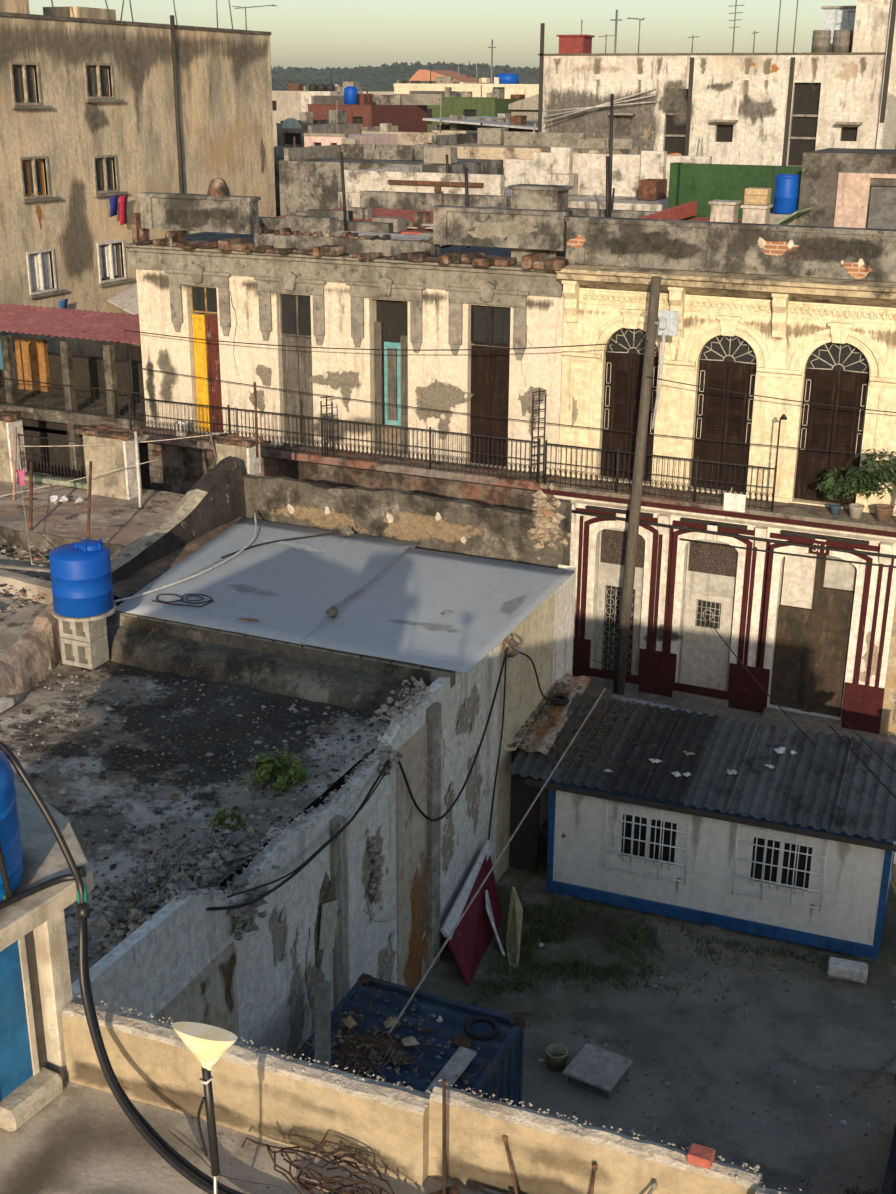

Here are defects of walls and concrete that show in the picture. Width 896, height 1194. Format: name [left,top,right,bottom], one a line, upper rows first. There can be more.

leakage [0,26,267,111]
spalling [756,237,799,259]
spalling [841,258,872,280]
leakage [146,352,176,423]
flaking render [361,826,388,922]
rust [403,923,425,988]